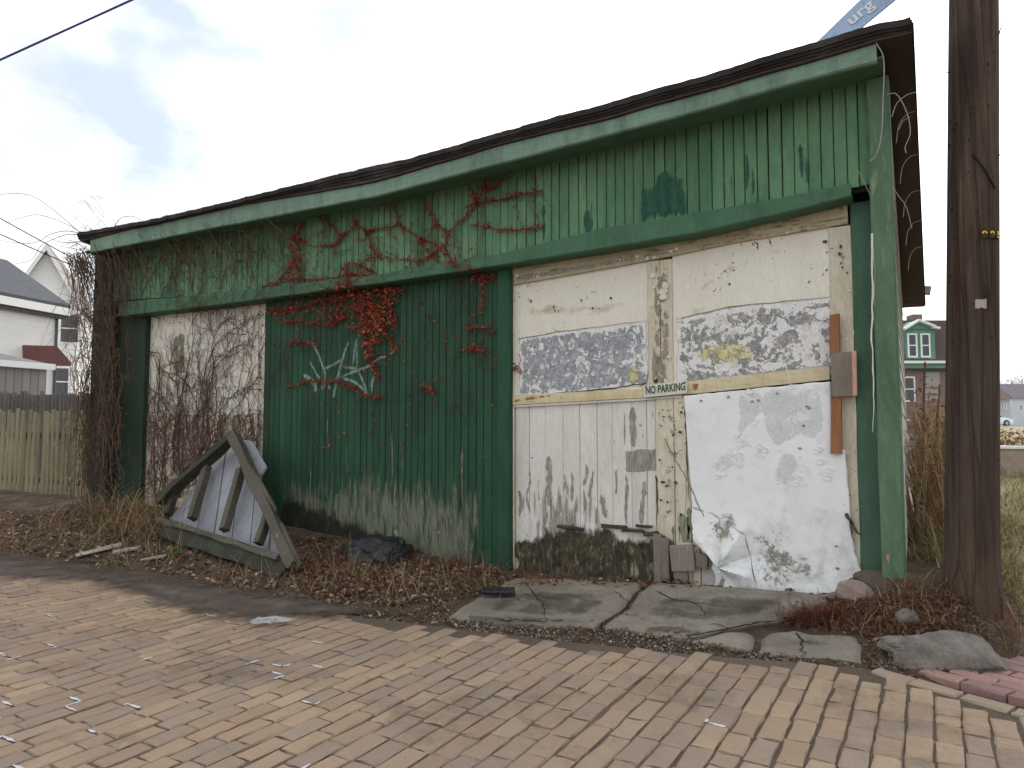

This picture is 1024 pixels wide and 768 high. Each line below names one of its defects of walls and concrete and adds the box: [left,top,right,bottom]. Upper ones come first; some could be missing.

peeling [515,247,831,395]
leakage [279,494,378,539]
crack [599,590,810,656]